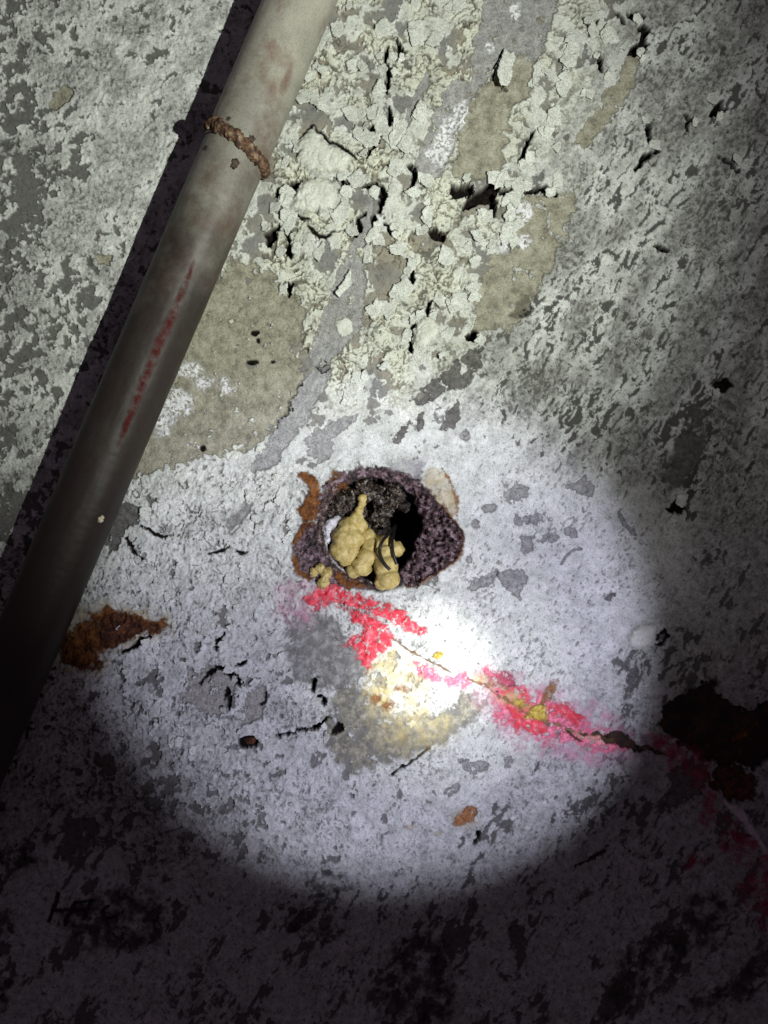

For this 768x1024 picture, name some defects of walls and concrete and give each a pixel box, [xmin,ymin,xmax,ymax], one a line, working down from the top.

peeling [634,115,661,172]
flaking render [98,0,649,554]
peeling [223,548,247,584]
corrosion [292,470,376,590]
spalling [334,477,529,586]
corrosion [60,604,168,673]
crack [390,636,666,755]
corrosion [453,806,481,826]